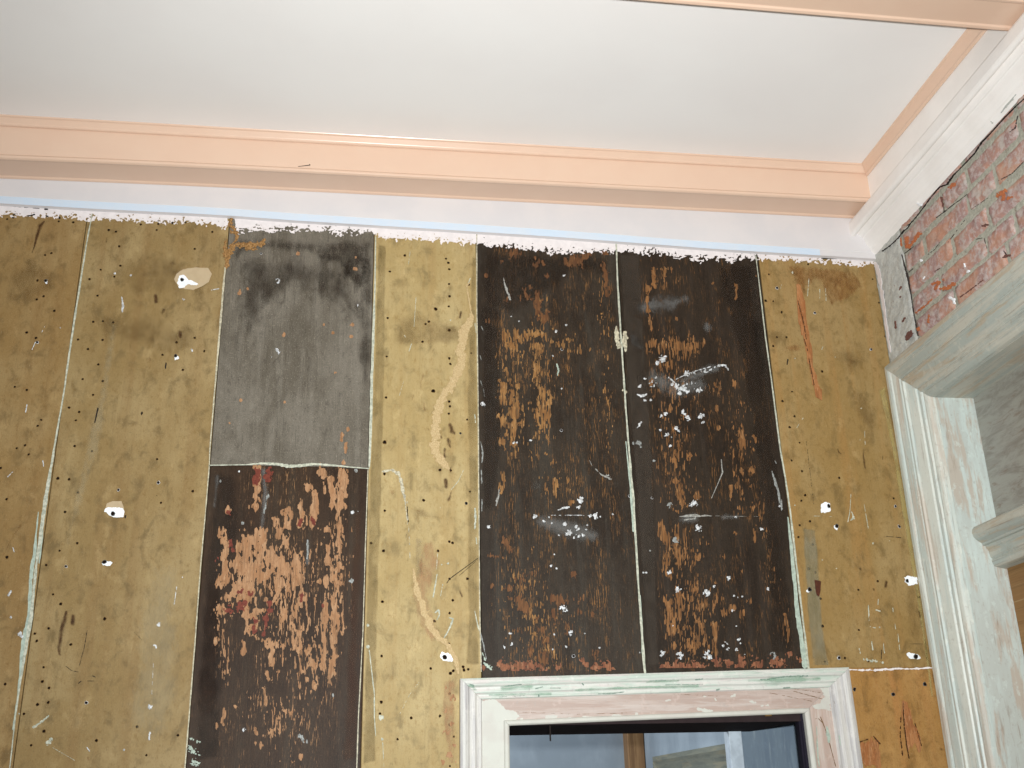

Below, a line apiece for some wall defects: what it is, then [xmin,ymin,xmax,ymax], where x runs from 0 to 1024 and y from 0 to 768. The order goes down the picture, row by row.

crack [882,99,1024,336]
peeling [213,427,354,763]
peeling [482,535,616,671]
peeling [485,248,615,506]
peeling [645,266,831,711]